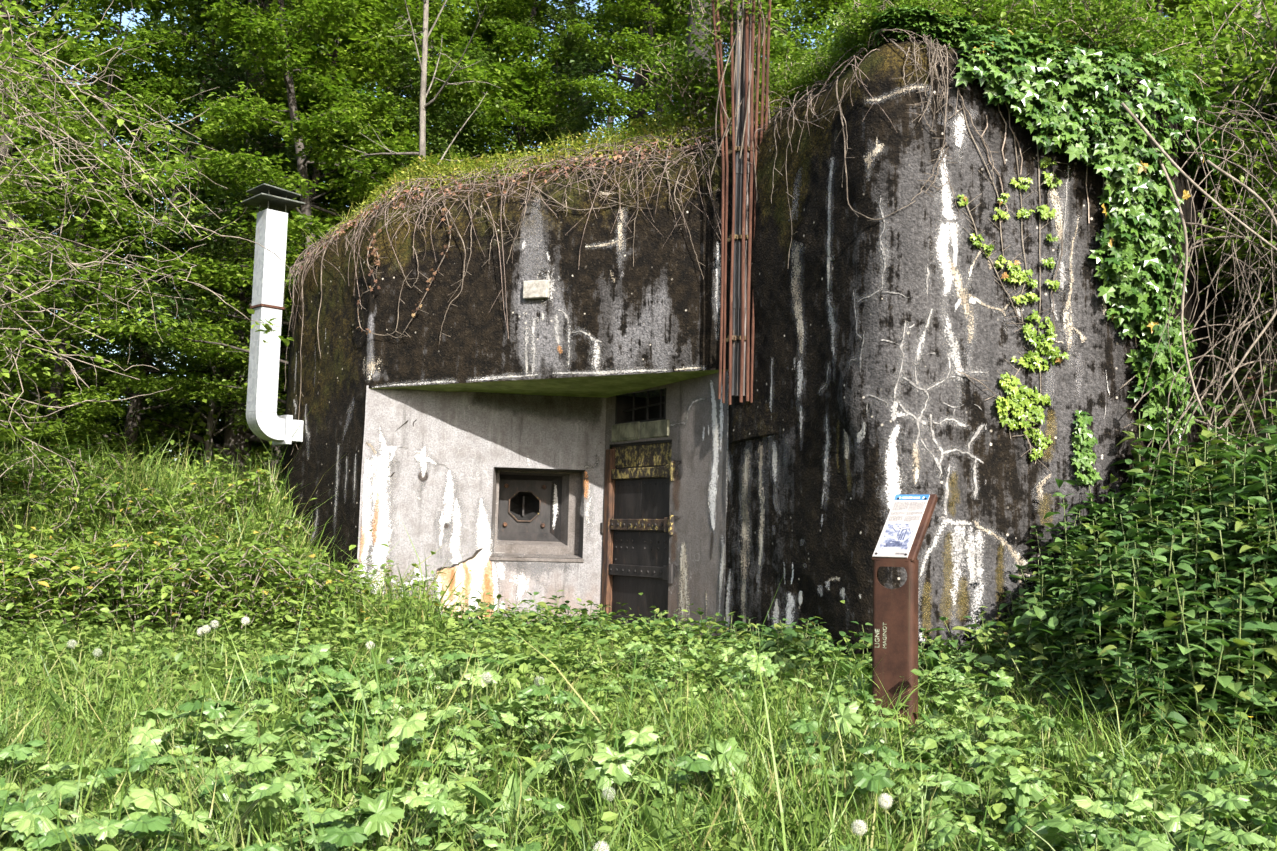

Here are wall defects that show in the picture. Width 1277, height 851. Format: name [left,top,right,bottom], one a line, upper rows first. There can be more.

crack [864,137,883,167]
leakage [827,157,836,355]
leakage [935,113,976,381]
leakage [372,312,702,419]
leakage [791,243,804,436]
crack [819,196,1032,577]
leakage [439,470,462,567]
leakage [476,497,493,565]
leakage [702,369,777,631]
leakage [884,421,920,509]
leakage [678,542,690,631]